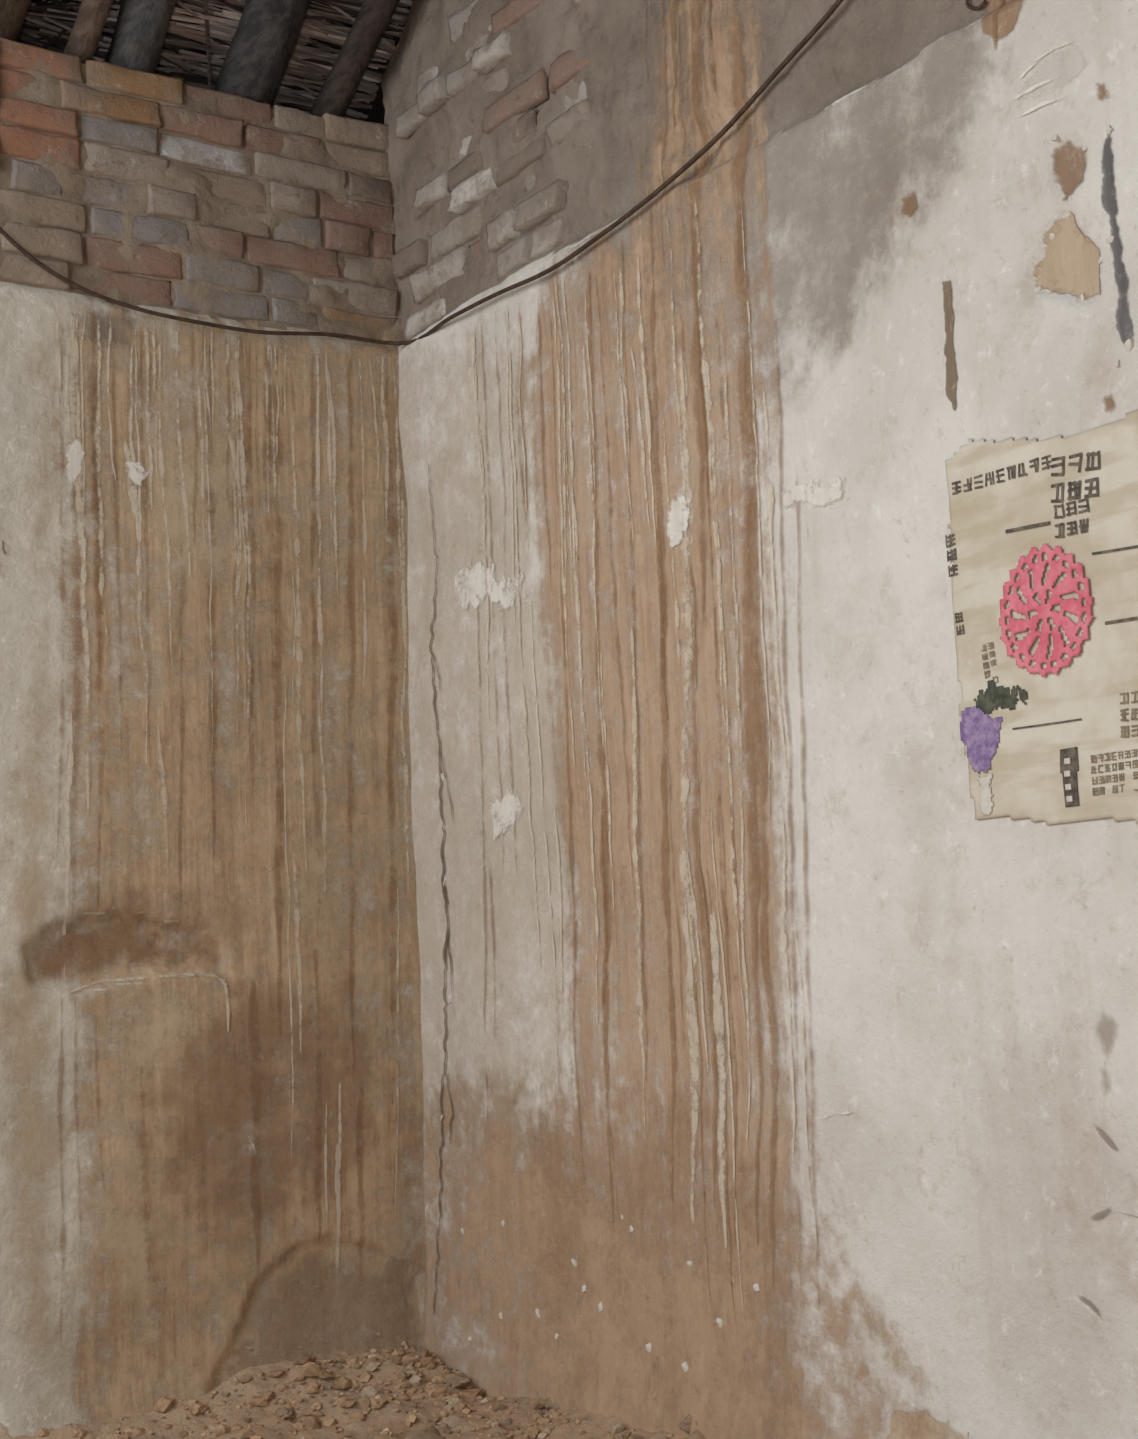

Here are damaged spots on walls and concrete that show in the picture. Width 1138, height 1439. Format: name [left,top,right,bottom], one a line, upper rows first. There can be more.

leakage [911,9,984,166]
spalling [1034,125,1134,368]
leakage [55,0,913,1439]
leakage [887,1409,969,1439]